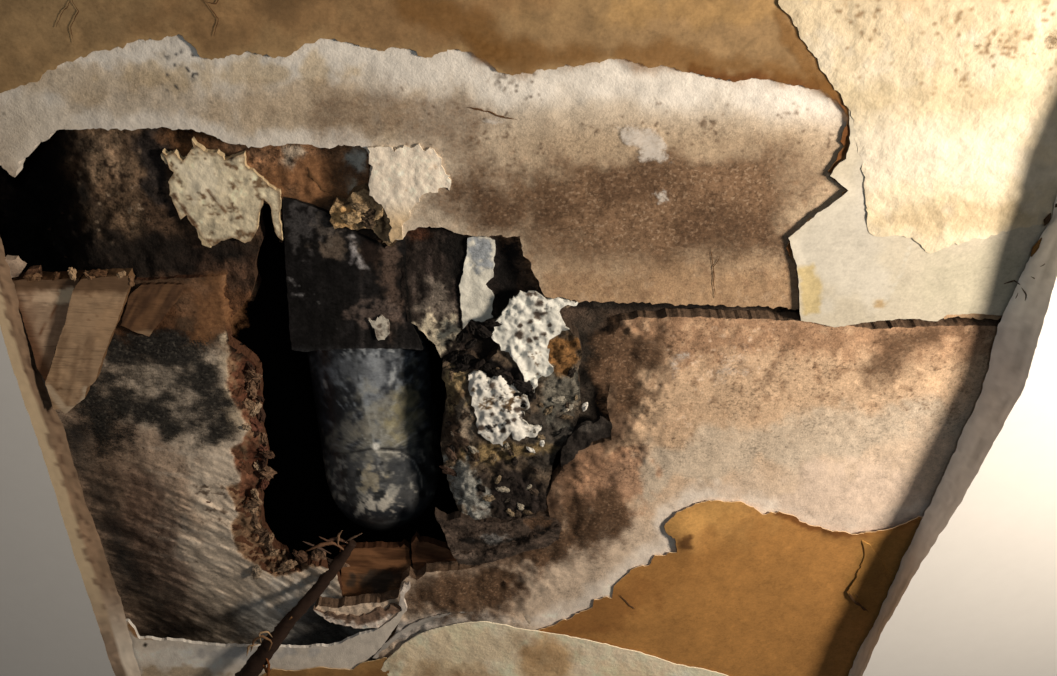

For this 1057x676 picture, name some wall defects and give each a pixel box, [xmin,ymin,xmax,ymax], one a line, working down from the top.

peeling [778,0,1057,253]
flaking render [161,137,284,248]
flaking render [330,143,451,247]
leakage [439,128,792,263]
flaking render [5,255,43,278]
mould [73,329,240,461]
flaking render [439,286,588,520]
leakage [592,332,685,414]
leakage [866,325,961,382]
flaking render [277,549,350,572]
flaking render [313,581,410,629]
leakage [407,476,632,622]